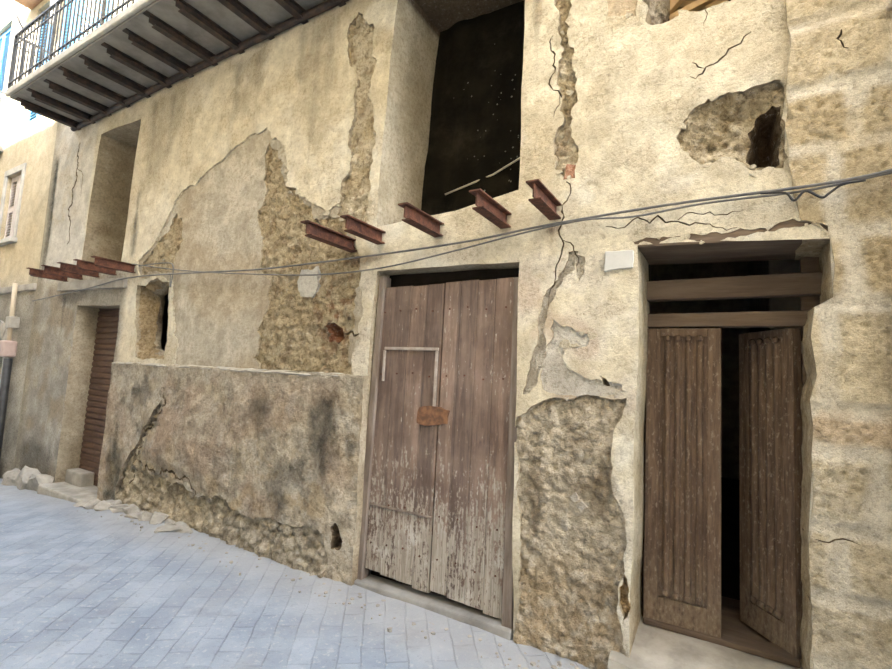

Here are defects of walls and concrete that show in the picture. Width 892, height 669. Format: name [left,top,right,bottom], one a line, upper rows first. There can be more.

crack [548,36,562,114]
flaking render [553,0,579,180]
spalling [607,0,679,25]
crack [690,32,751,79]
flaking render [676,79,788,178]
peeling [135,12,377,375]
crack [548,181,579,306]
crack [606,211,740,230]
crack [126,387,196,496]
flaking render [114,400,343,578]
flaking render [513,251,631,669]